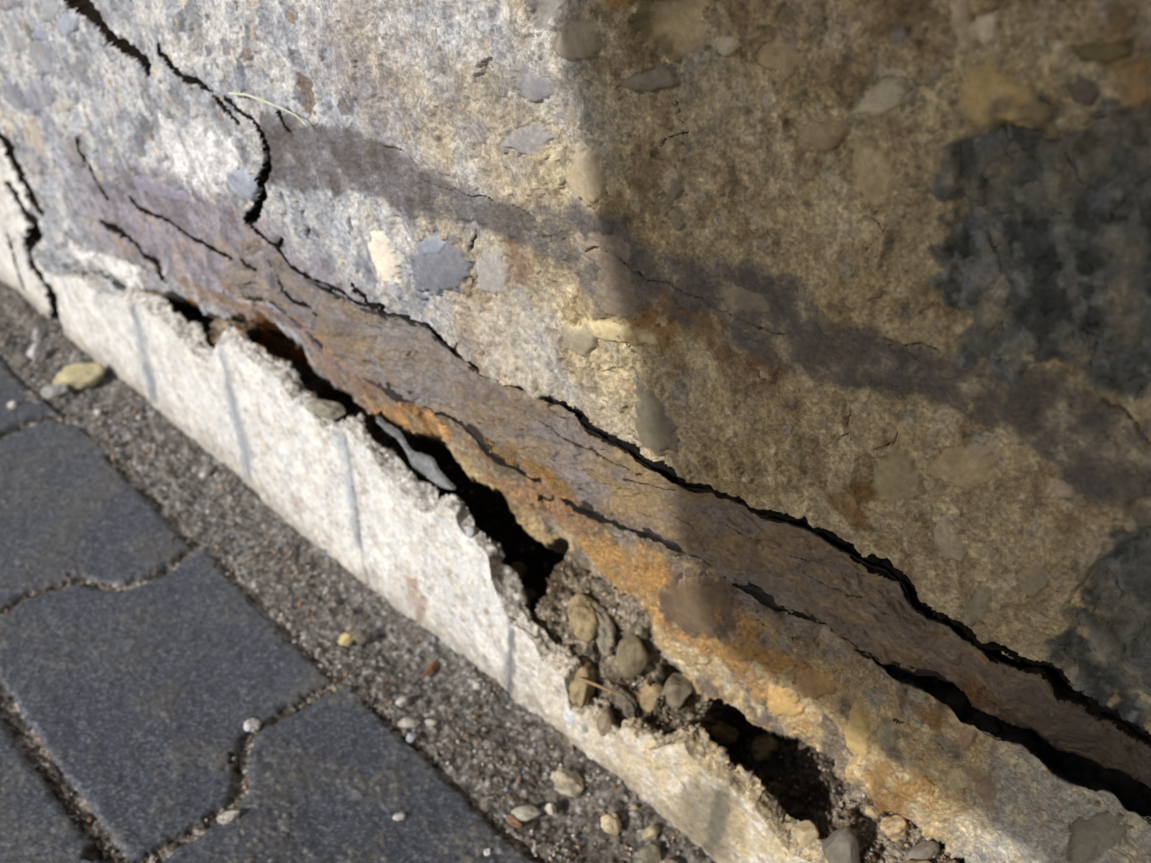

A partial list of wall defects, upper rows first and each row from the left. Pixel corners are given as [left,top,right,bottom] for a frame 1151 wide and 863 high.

crack [0,133,64,332]
crack [61,0,387,317]
rust [236,315,309,365]
rust [374,402,451,438]
crack [427,234,507,382]
spalling [0,0,1151,685]
crack [387,146,789,335]
spalling [220,237,1151,789]
rust [577,537,807,697]
crack [509,391,1151,749]
water stain [928,101,1151,393]
water stain [1048,525,1151,730]